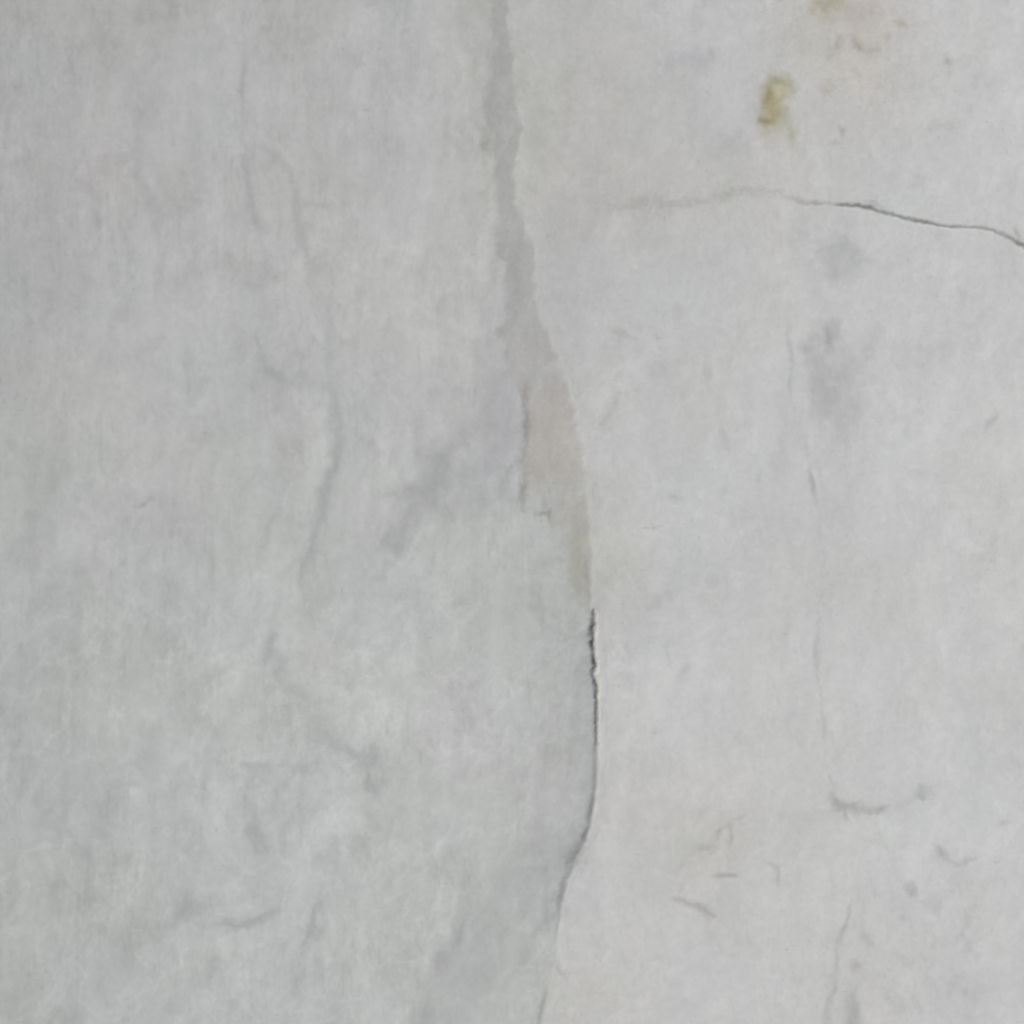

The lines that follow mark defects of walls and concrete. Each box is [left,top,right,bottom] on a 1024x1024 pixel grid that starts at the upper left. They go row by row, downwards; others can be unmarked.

rust [750,66,811,158]
crack [591,180,1024,252]
crack [533,608,608,1024]